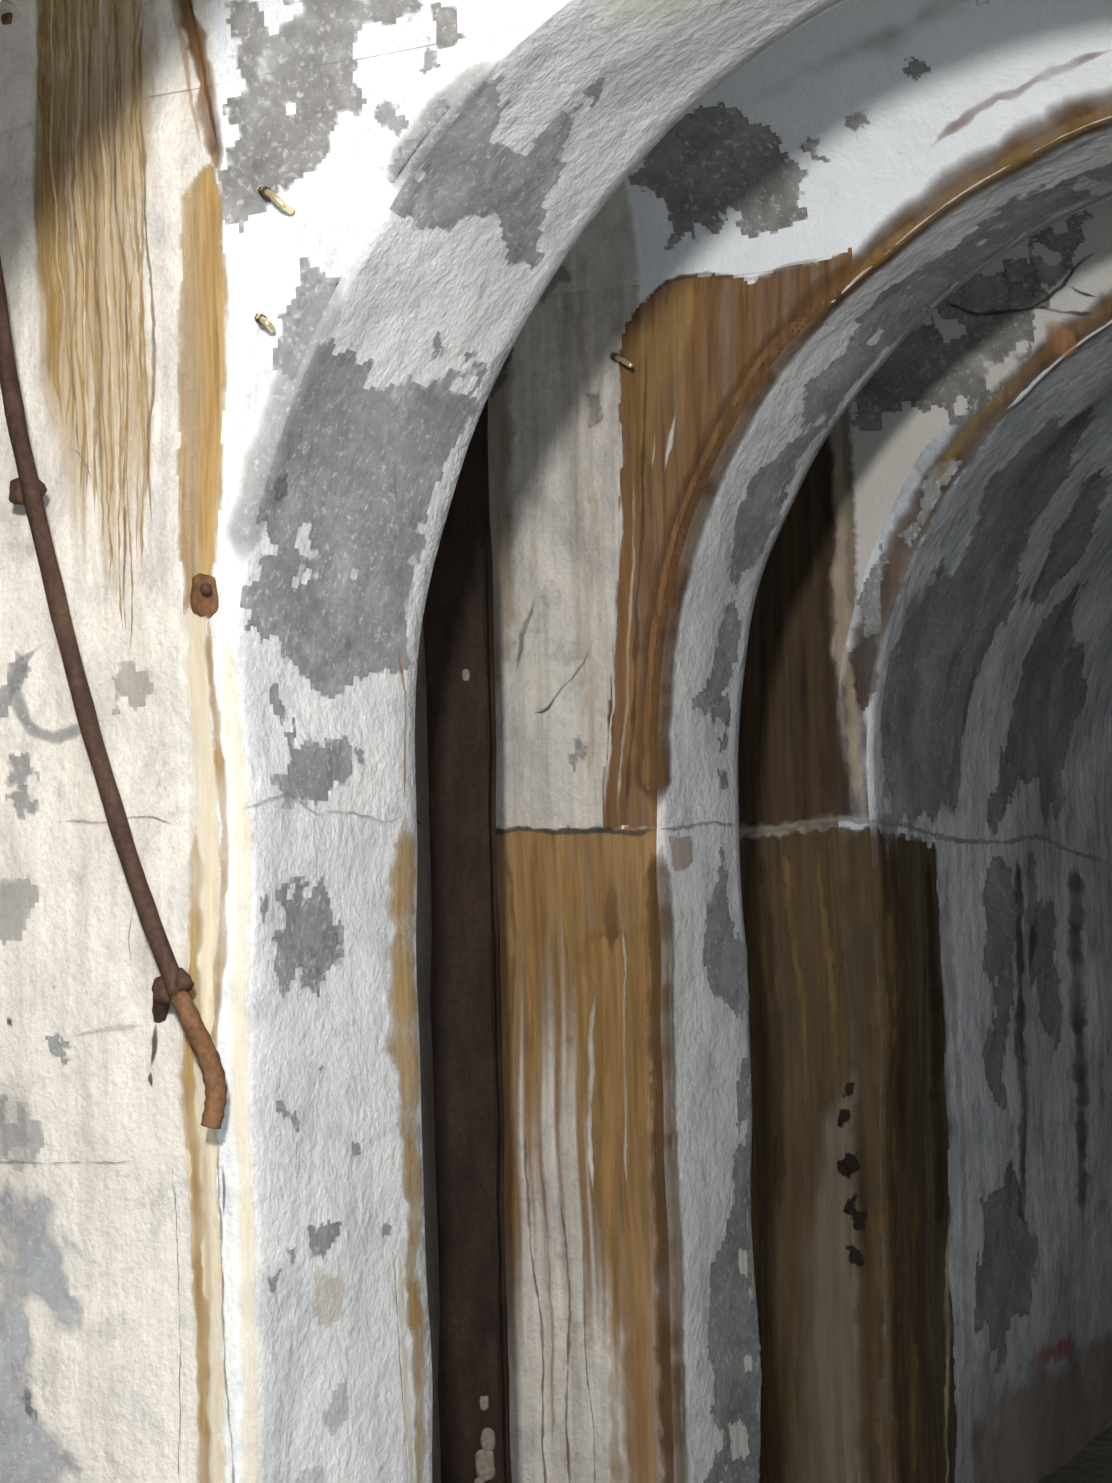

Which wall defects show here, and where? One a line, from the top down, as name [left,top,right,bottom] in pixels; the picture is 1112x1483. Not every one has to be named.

rust [35,0,155,644]
rust [177,0,227,1046]
peeling [233,257,487,699]
peeling [627,103,829,250]
peeling [902,56,931,80]
peeling [668,836,693,871]
peeling [702,847,749,1019]
rust [496,94,1112,1483]
peeling [982,856,1062,1111]
rust [181,1031,227,1483]
peeling [703,1058,762,1483]
peeling [974,1161,1038,1373]